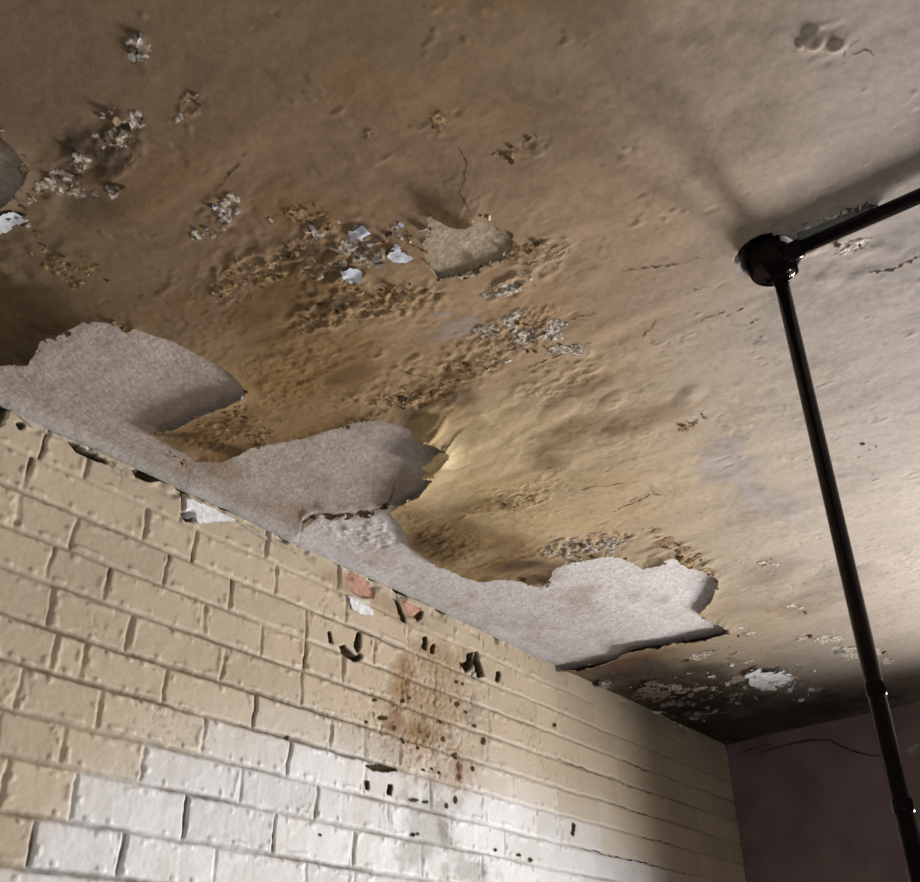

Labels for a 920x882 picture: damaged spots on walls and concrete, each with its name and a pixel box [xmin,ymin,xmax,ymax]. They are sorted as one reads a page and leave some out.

peeling [126,32,151,63]
peeling [0,109,145,290]
flaking render [209,202,550,334]
flaking render [0,309,758,670]
hole [459,652,482,680]
peeling [630,646,823,723]
crack [737,739,881,757]